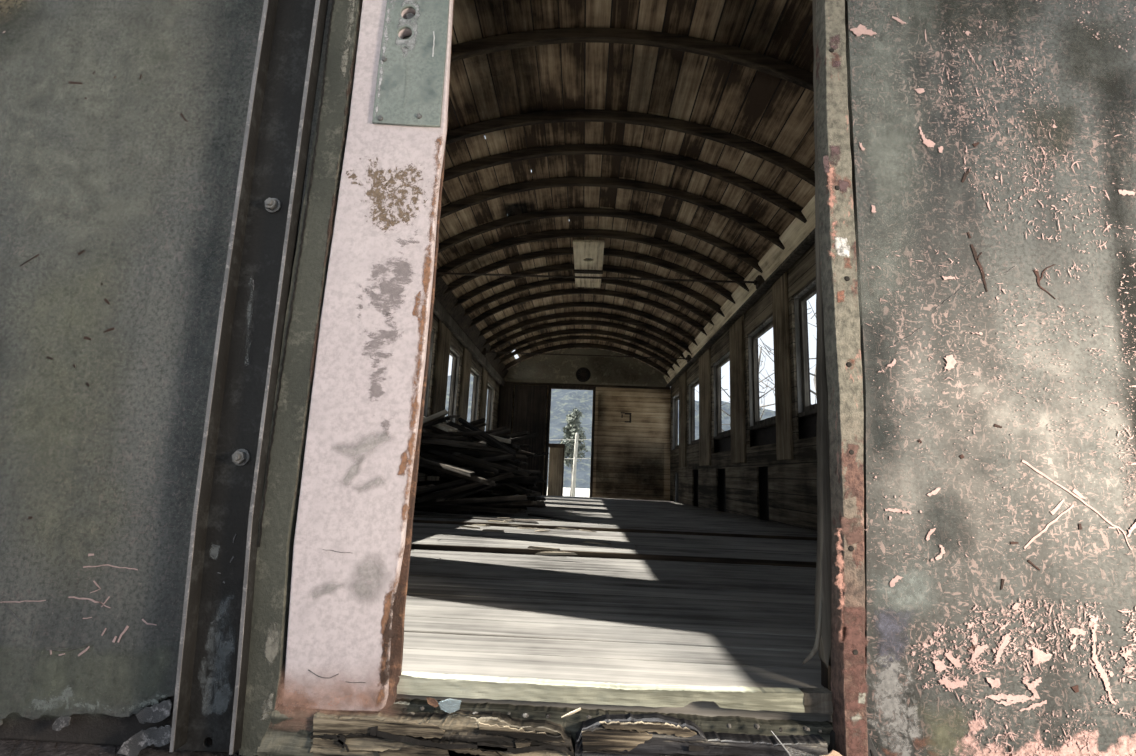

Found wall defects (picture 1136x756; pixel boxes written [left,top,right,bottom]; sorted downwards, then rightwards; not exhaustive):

damp [1107,77,1131,229]
corrosion [336,137,442,522]
peeling [863,16,1136,587]
damp [1116,251,1136,352]
damp [1128,379,1136,424]
peeling [29,686,173,756]
corrosion [836,517,938,756]
peeling [911,598,1136,756]